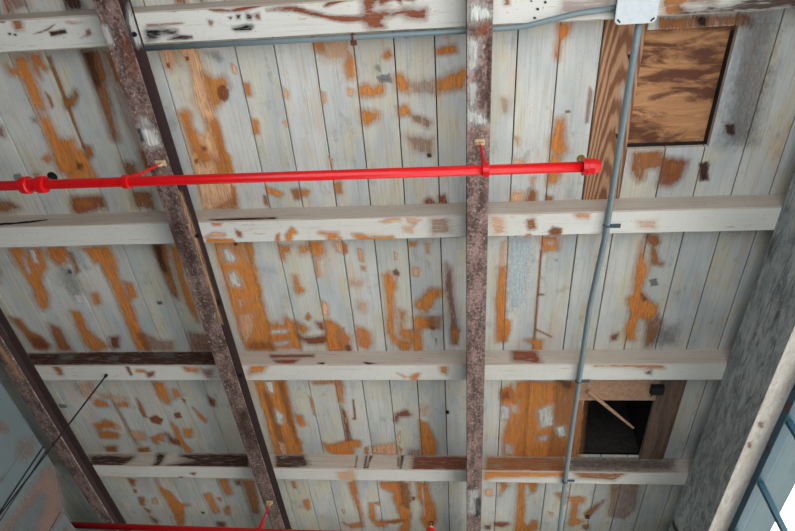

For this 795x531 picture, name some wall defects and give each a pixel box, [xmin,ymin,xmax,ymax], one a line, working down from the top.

peeling [8,55,97,179]
peeling [161,49,234,174]
peeling [274,0,426,28]
rust [477,19,491,119]
peeling [10,244,215,403]
peeling [199,184,372,468]
peeling [384,268,459,351]
peeling [611,235,663,345]
peeling [90,420,249,478]
peeling [338,470,436,531]
peeling [412,421,466,470]
peeling [476,380,584,531]